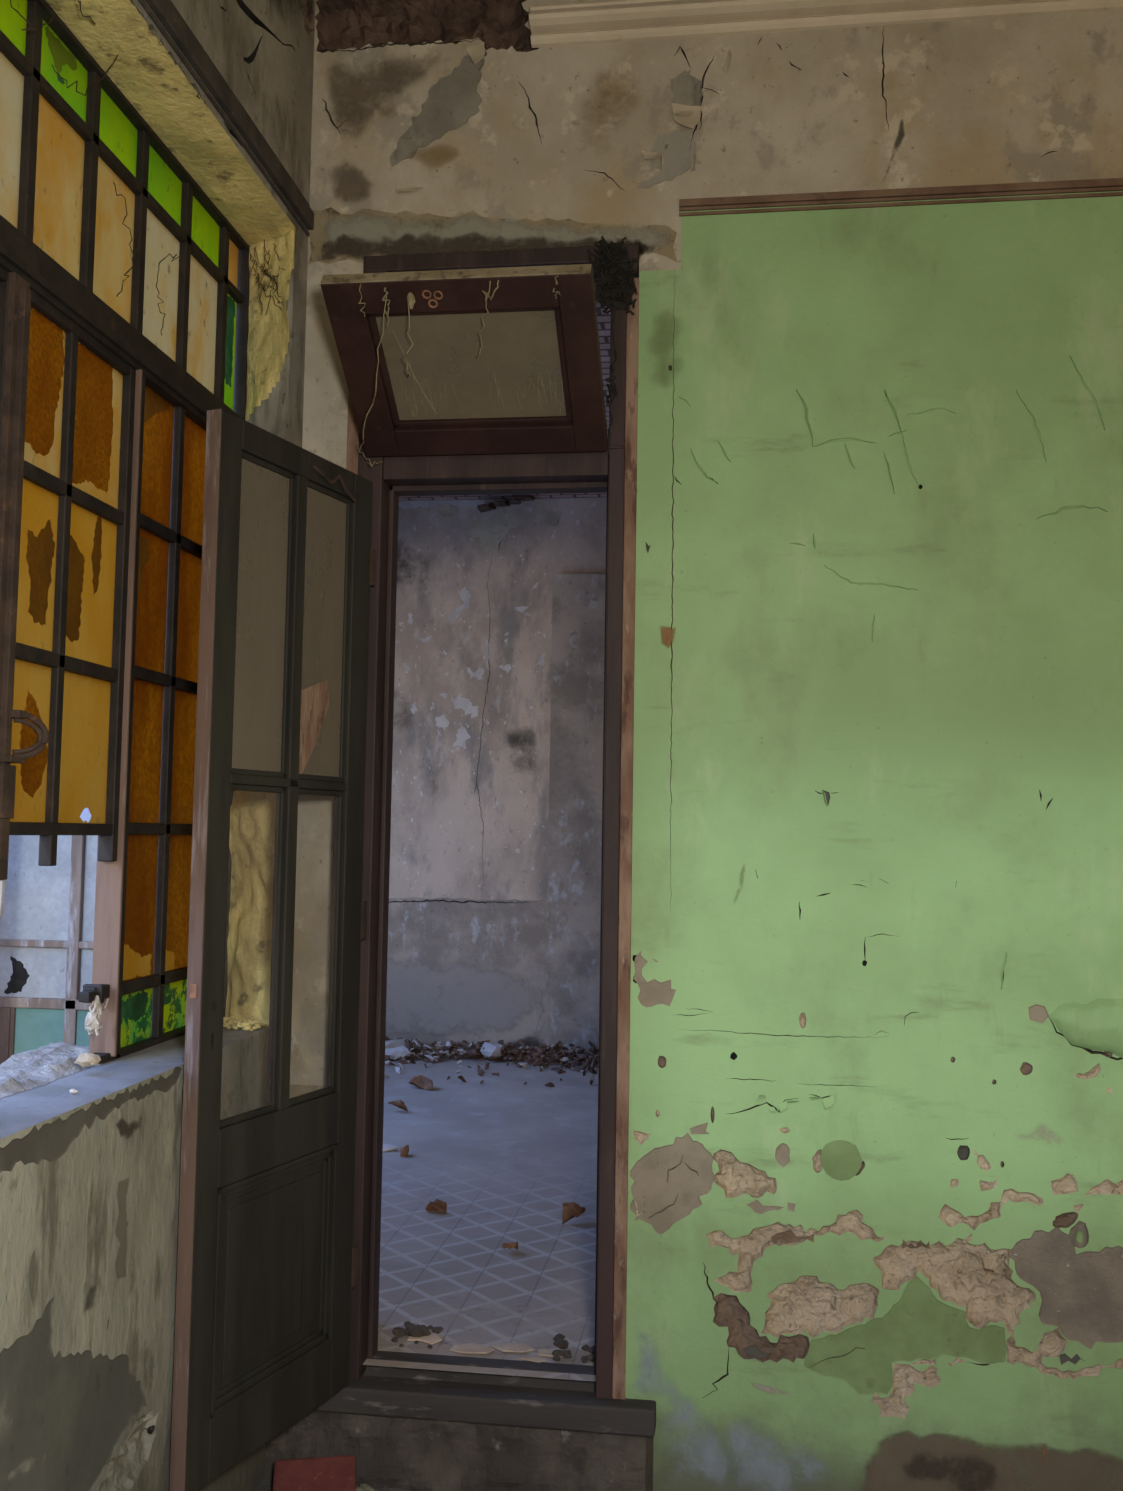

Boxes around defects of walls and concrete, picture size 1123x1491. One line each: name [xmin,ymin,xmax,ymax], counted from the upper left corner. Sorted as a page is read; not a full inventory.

crack [218,0,487,92]
crack [323,100,345,135]
damp [332,62,423,125]
crack [519,83,542,144]
peeling [586,47,732,191]
damp [336,169,368,200]
damp [508,734,532,748]
peeling [633,951,676,1007]
spalling [0,1041,102,1099]
peeling [0,1067,182,1173]
peeling [630,1094,1123,1418]
damp [865,1432,1123,1491]